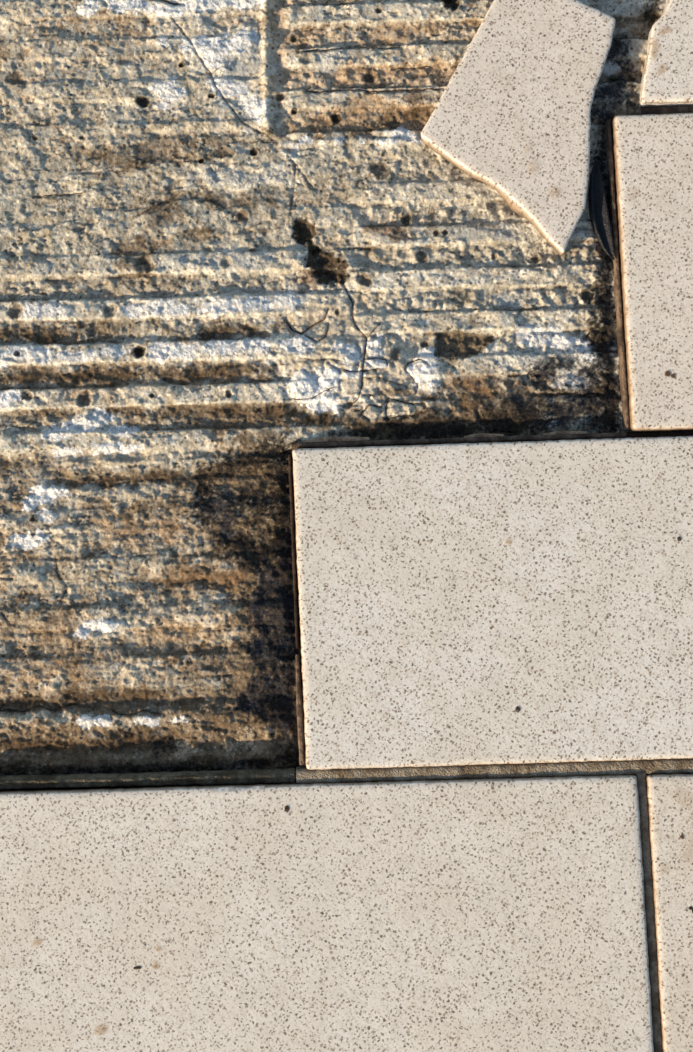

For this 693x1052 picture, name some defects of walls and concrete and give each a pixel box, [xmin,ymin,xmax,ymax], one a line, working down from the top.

hole [442,0,460,11]
damp [643,0,663,22]
spalling [136,96,150,107]
crack [162,0,313,215]
spalling [381,113,399,130]
damp [590,36,640,225]
hole [371,163,391,179]
spalling [135,255,154,275]
spalling [292,218,372,286]
crack [286,284,427,420]
spalling [434,328,495,362]
damp [0,217,622,776]